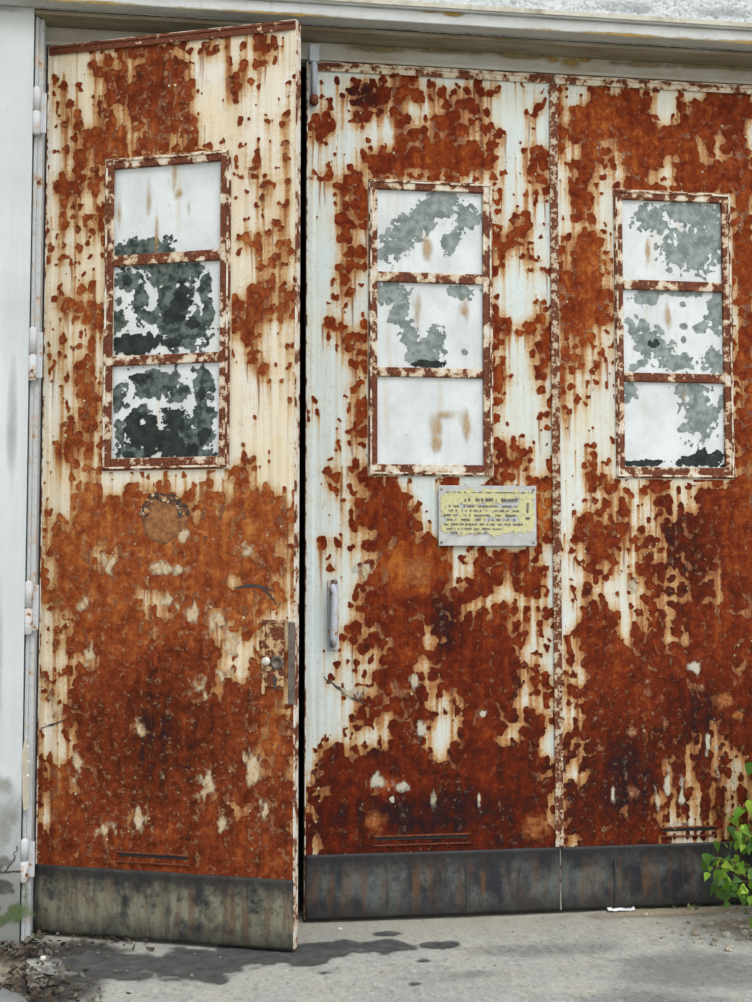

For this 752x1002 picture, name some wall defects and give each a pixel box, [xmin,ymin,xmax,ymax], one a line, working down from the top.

leakage [0,857,14,894]
leakage [62,931,460,984]